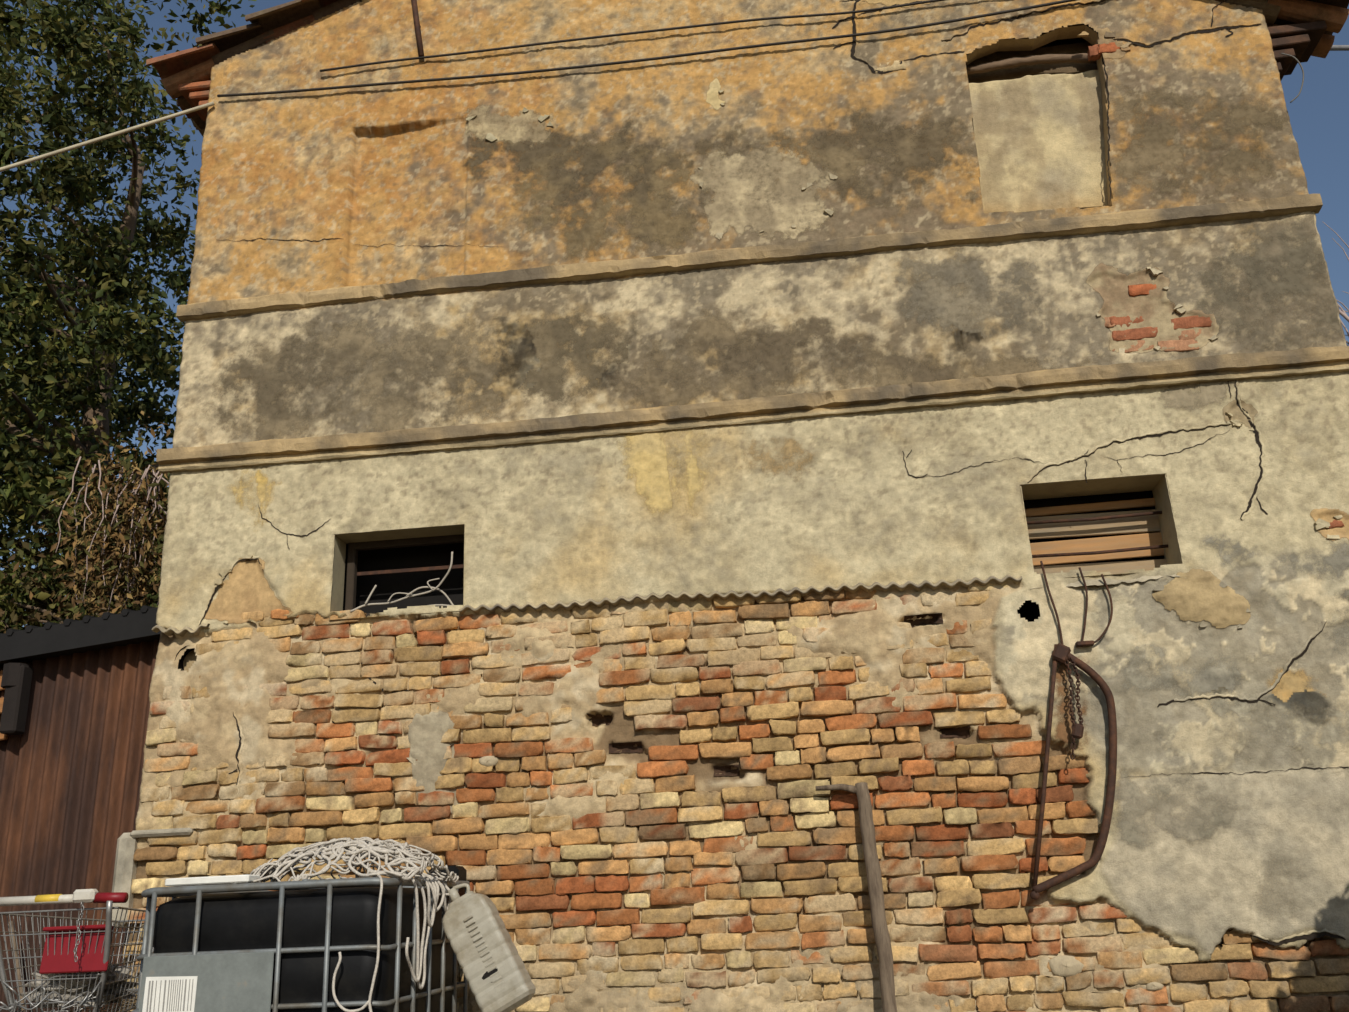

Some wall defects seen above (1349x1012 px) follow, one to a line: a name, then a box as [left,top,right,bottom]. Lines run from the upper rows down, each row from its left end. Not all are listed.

crack [832,0,1104,74]
crack [1102,0,1261,204]
spalling [1086,263,1219,353]
crack [903,380,1268,520]
spalling [1310,508,1349,541]
spalling [204,555,299,624]
spalling [904,613,943,627]
spalling [1017,600,1040,622]
crack [1157,620,1327,707]
spalling [587,713,613,726]
spalling [609,741,643,753]
spalling [939,725,970,738]